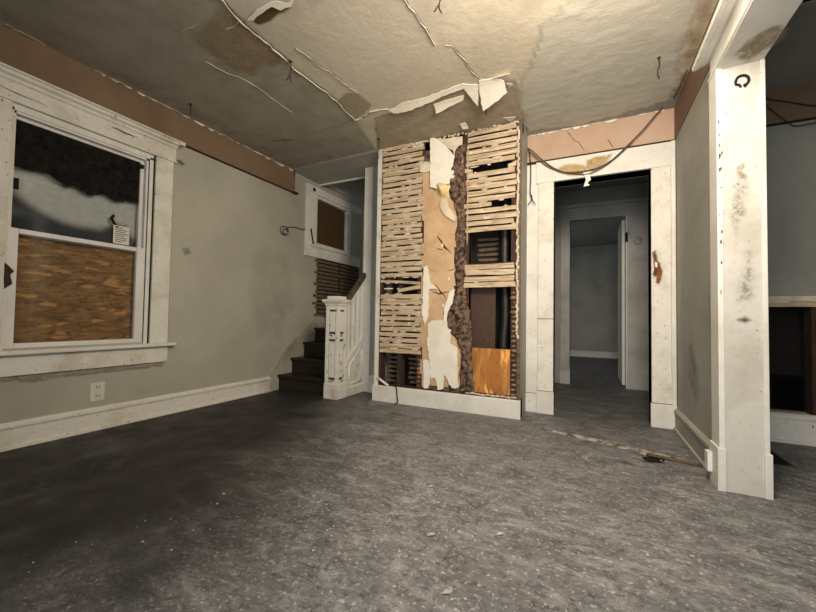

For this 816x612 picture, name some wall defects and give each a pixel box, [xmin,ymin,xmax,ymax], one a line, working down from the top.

leakage [203,16,281,73]
crack [205,61,291,112]
crack [222,0,389,142]
crack [405,0,482,80]
peeling [389,73,513,114]
peeling [530,119,617,136]
spalling [380,117,520,393]
corrosion [653,251,662,284]